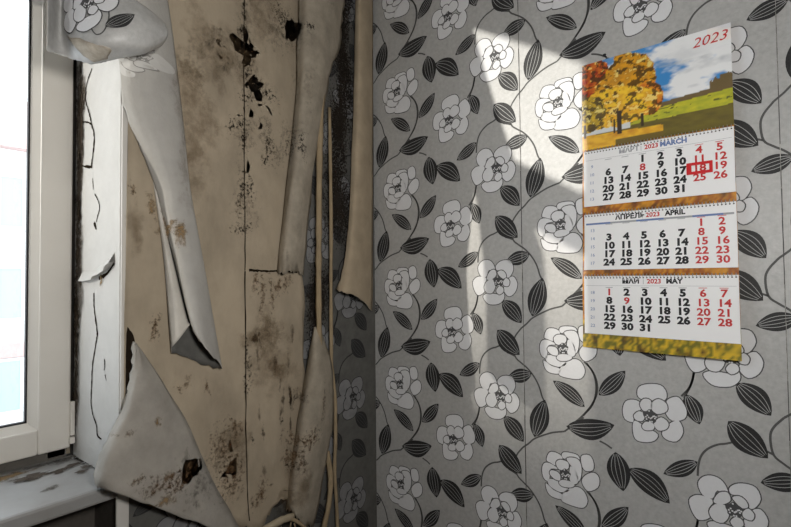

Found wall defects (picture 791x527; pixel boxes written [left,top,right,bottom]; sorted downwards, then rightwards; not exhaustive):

damp [322,0,354,251]
peeling [78,255,114,285]
damp [304,260,329,355]
crack [90,293,106,439]
spalling [7,462,91,483]